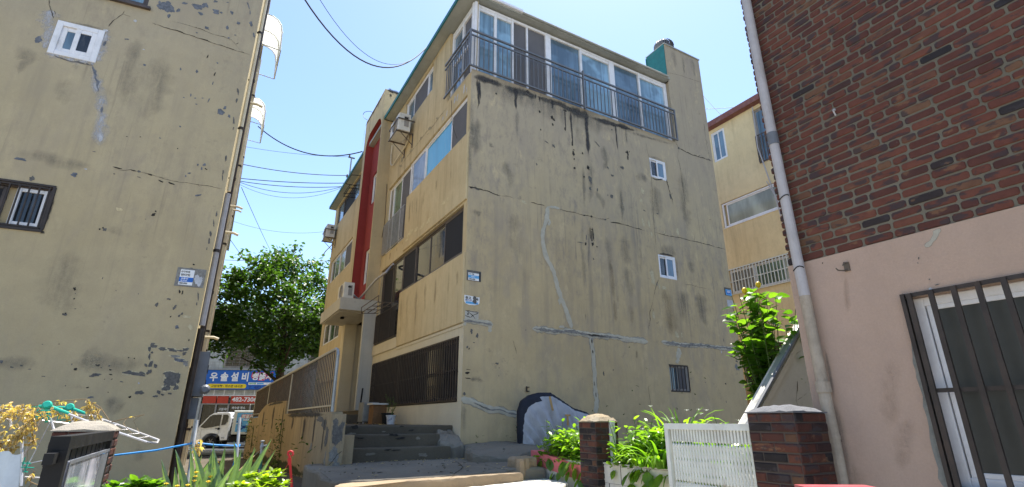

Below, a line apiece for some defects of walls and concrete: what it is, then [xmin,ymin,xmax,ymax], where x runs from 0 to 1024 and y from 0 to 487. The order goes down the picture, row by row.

crack [159,22,246,54]
peeling [157,0,255,39]
leakage [476,75,633,152]
crack [113,167,220,189]
crack [463,121,736,414]
peeling [86,290,199,398]
crack [461,396,517,418]
flaking render [309,416,363,466]